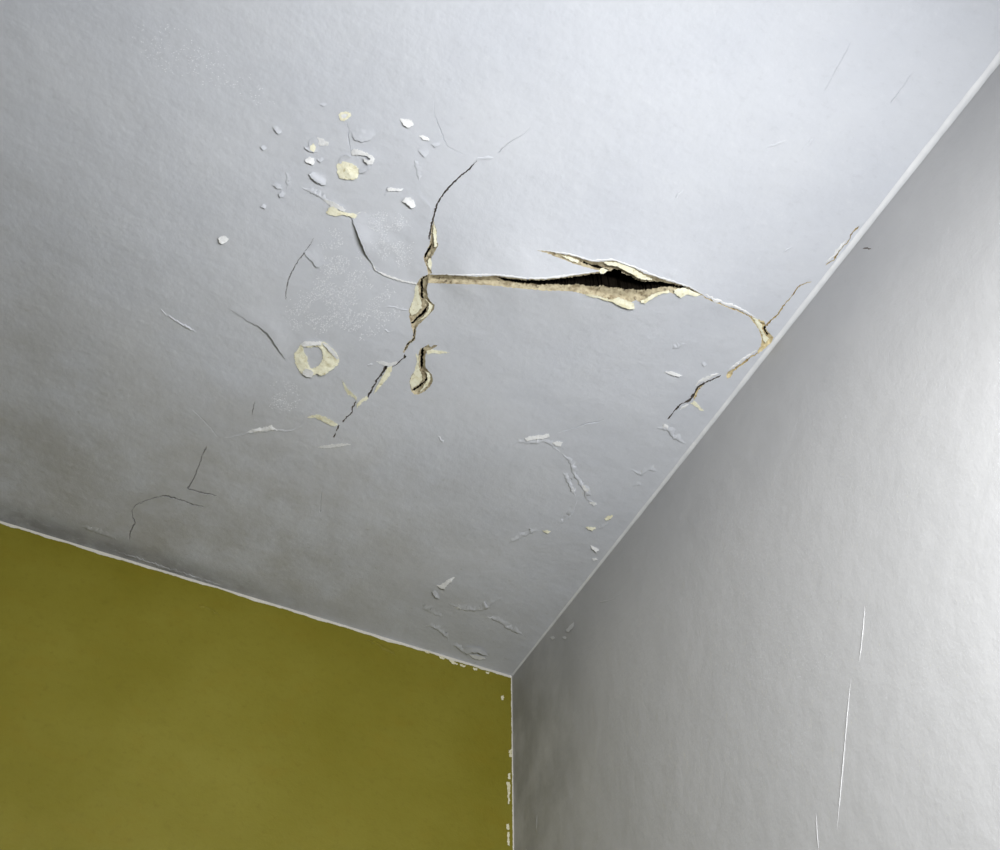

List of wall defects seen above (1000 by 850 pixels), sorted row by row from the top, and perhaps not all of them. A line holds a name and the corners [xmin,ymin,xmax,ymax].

peeling [272,119,441,285]
crack [333,101,871,437]
crack [129,446,216,541]
peeling [513,434,597,506]